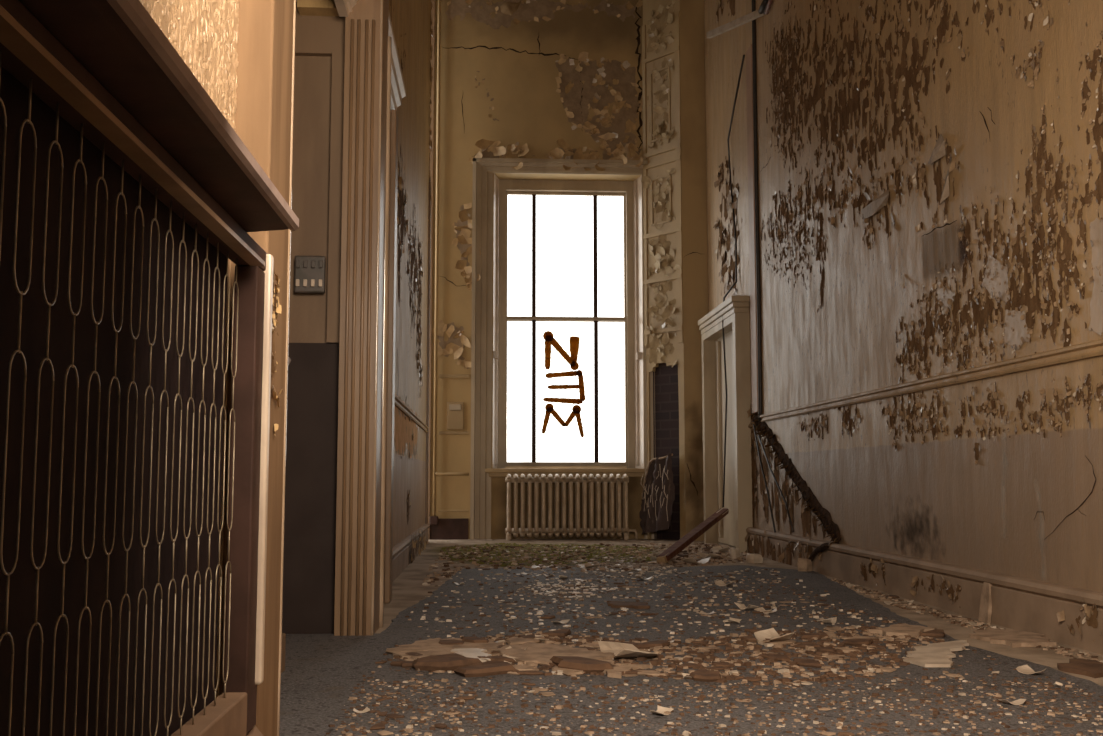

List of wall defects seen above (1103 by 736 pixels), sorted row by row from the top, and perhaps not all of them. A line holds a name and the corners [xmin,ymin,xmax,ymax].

crack [441,36,583,113]
peeling [394,1,471,460]
peeling [451,203,481,291]
peeling [468,52,681,367]
peeling [713,156,740,295]
peeling [760,0,1103,452]
crack [1034,457,1096,540]